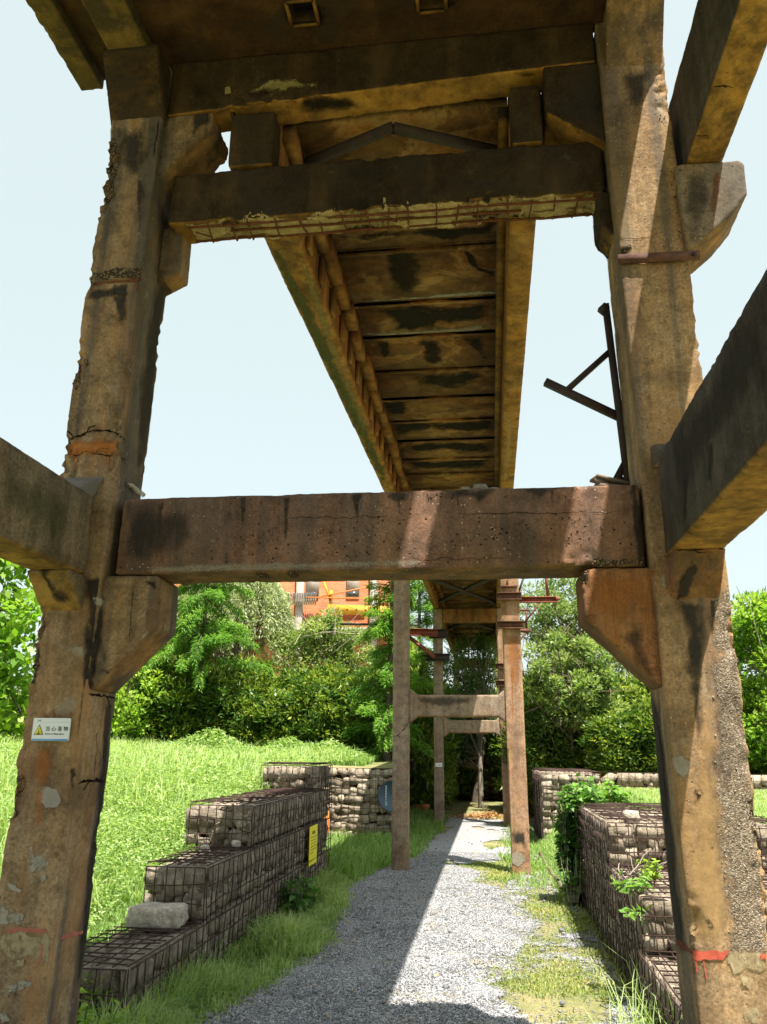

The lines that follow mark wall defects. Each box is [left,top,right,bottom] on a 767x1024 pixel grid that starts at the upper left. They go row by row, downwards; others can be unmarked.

spalling [102,138,120,202]
spalling [186,193,597,243]
damp [359,223,494,240]
spalling [90,267,142,285]
damp [90,285,127,320]
damp [375,252,494,389]
crack [67,425,148,471]
damp [130,504,185,555]
crack [457,506,618,515]
crack [79,732,106,790]
spalling [695,585,767,986]